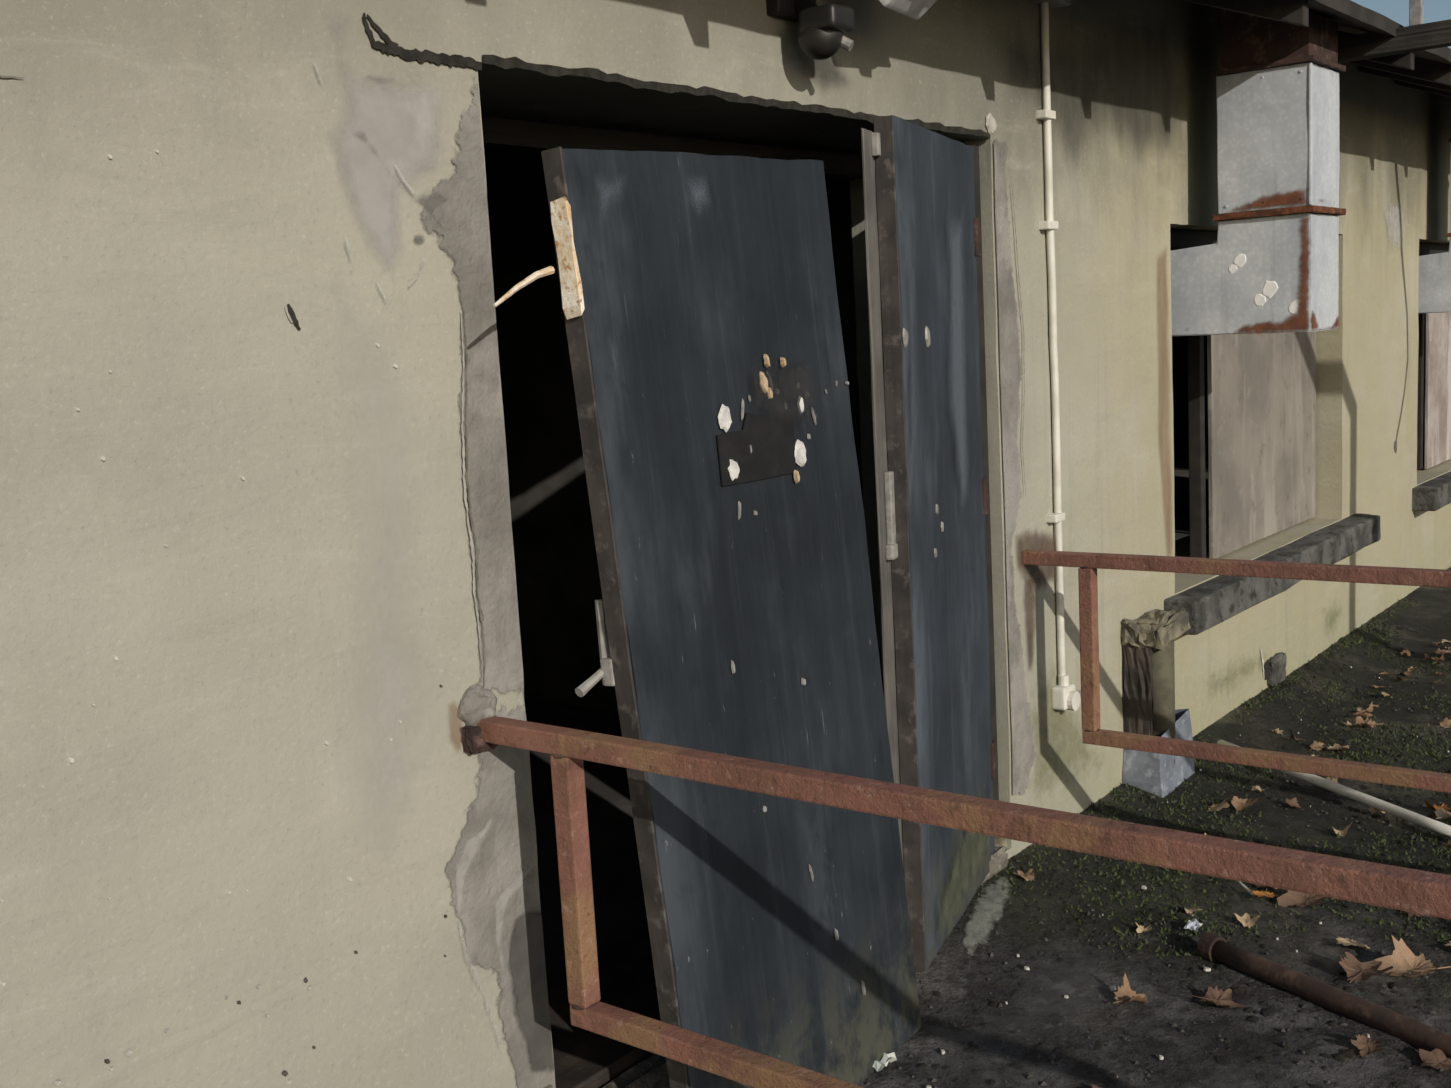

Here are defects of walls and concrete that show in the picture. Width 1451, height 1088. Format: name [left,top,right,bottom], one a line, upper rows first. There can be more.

crack [362,13,482,70]
rust [1236,190,1339,333]
crack [461,311,486,688]
spalling [452,685,498,755]
peeling [444,824,489,918]
peeling [496,866,531,961]